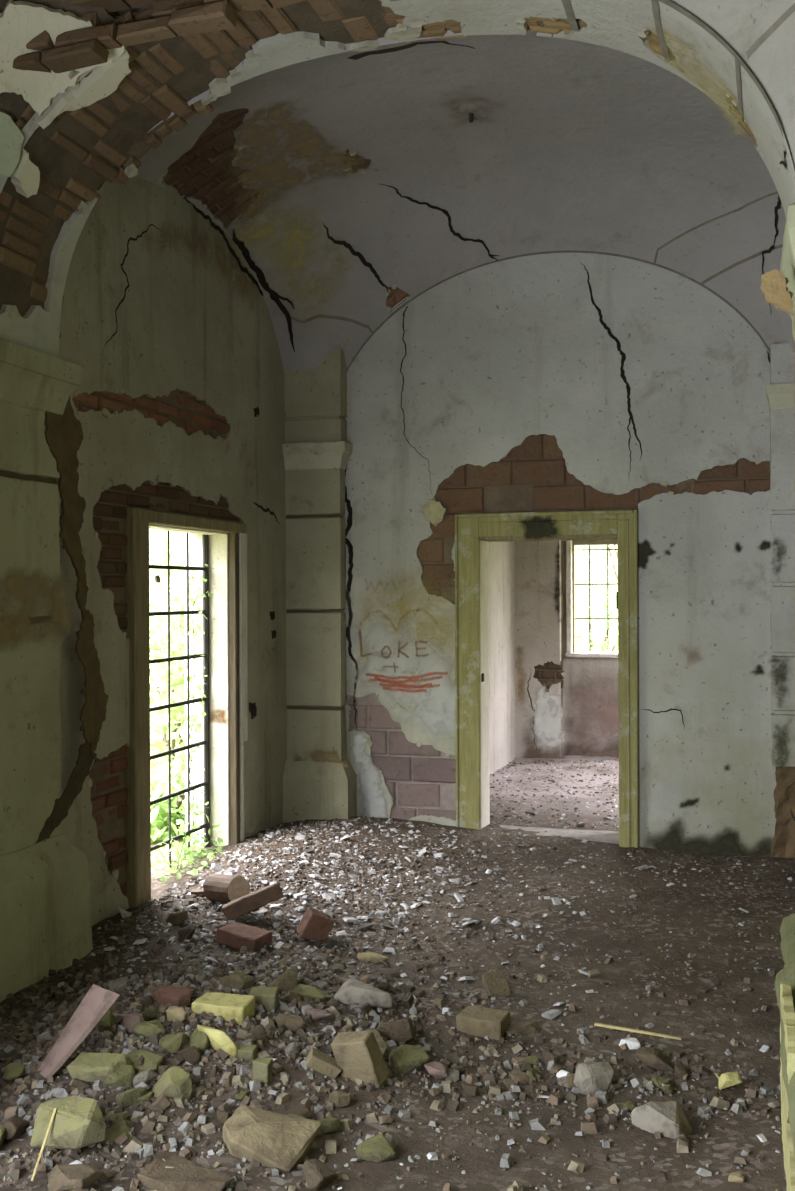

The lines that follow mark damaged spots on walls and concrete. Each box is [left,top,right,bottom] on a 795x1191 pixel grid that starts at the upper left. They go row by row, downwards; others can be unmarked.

crack [175,187,295,352]
crack [381,184,500,261]
crack [580,262,642,475]
flaking render [417,434,770,604]
spalling [44,389,247,897]
spalling [249,702,257,721]
flaking render [346,692,456,821]
flaking render [533,659,566,695]